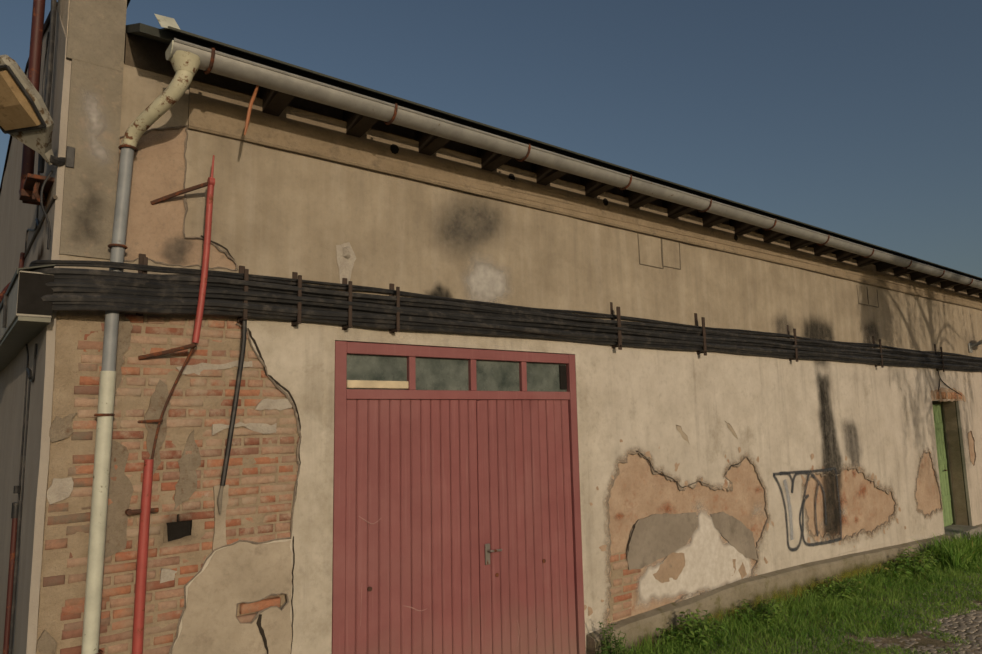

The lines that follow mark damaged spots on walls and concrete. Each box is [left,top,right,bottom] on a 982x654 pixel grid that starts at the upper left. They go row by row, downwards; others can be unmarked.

flaking render [36,311,105,654]
flaking render [98,312,302,654]
spalling [584,421,774,627]
leakage [819,376,859,537]
spalling [801,454,906,548]
spalling [915,449,943,518]
spalling [967,431,976,466]